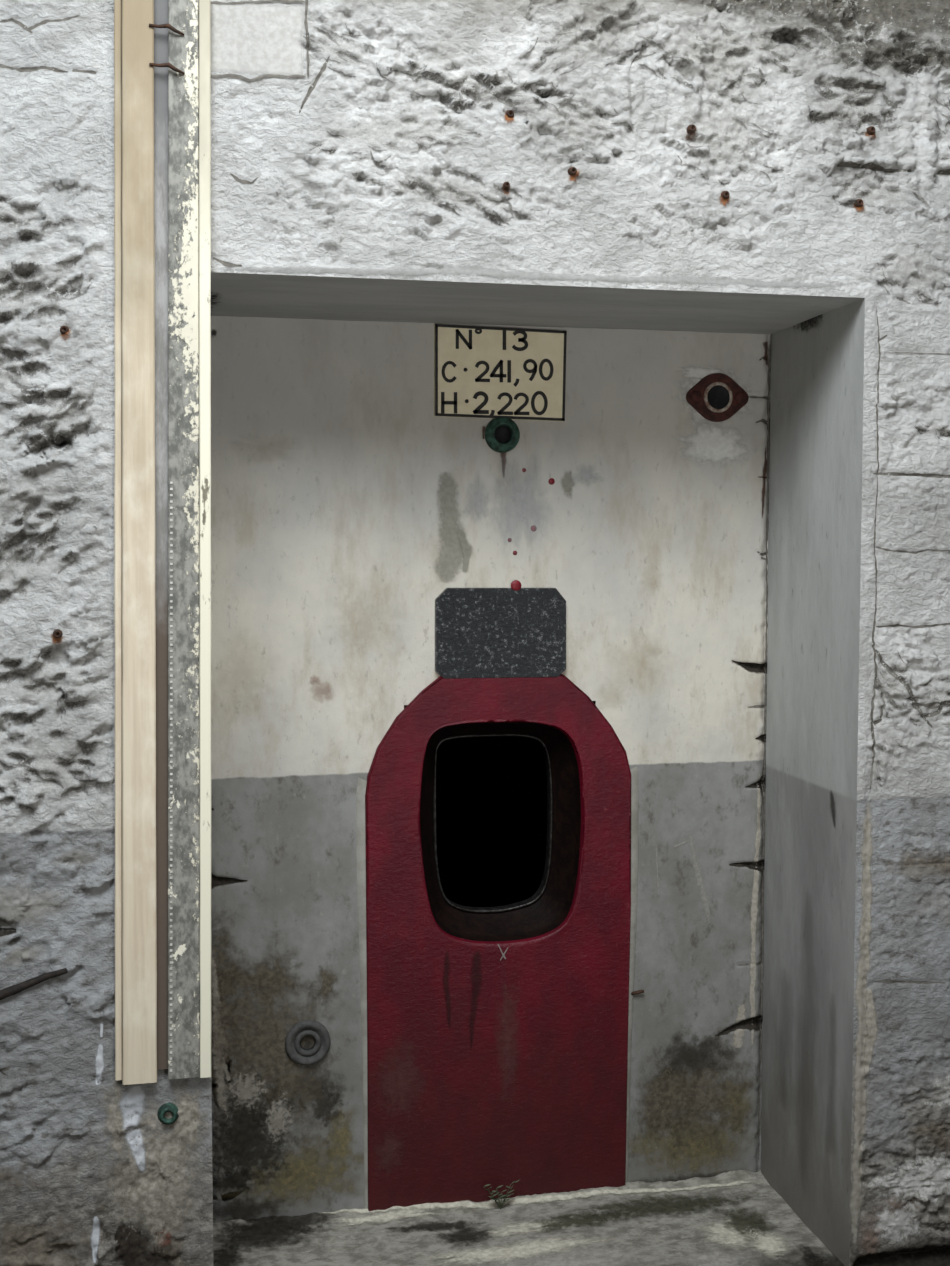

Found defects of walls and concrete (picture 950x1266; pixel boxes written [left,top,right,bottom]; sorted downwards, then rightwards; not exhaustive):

crack [0,15,80,33]
crack [0,64,96,74]
leakage [437,473,472,581]
crack [870,310,950,789]
leakage [211,933,340,1221]